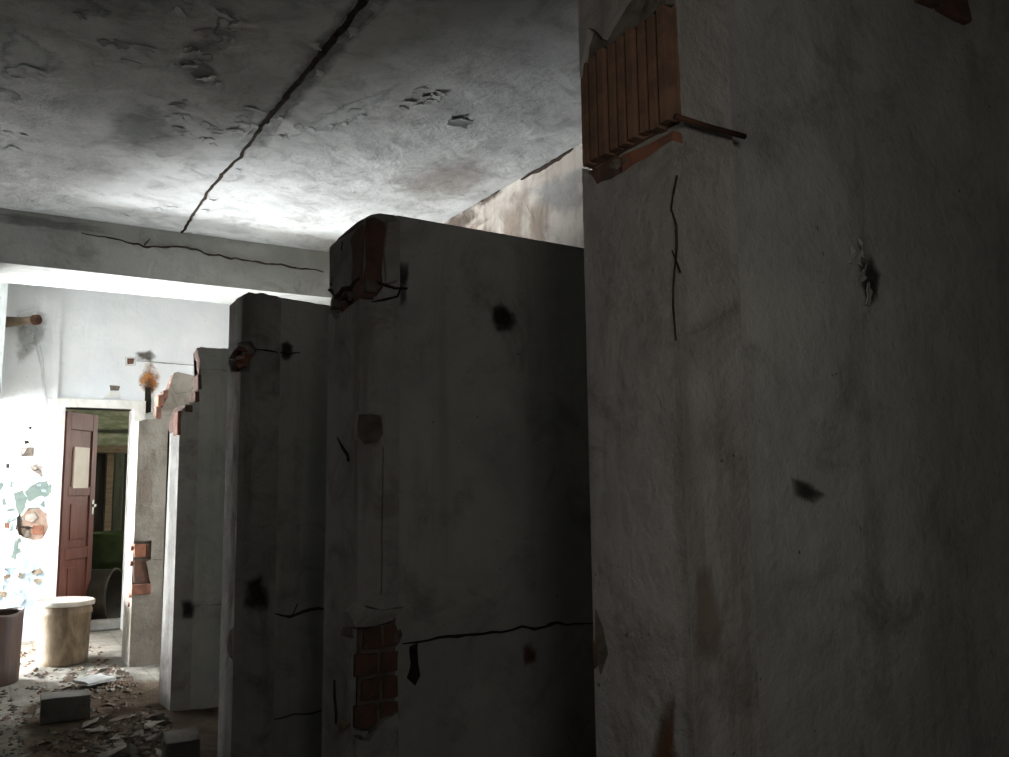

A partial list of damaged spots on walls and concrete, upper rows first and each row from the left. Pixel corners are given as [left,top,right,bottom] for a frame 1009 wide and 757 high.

spalling [581,0,682,184]
crack [82,0,381,272]
leakage [445,193,497,231]
leakage [504,174,575,241]
flaking render [153,390,169,419]
flaking render [173,375,202,436]
peeling [0,463,52,618]
spalling [127,544,151,607]